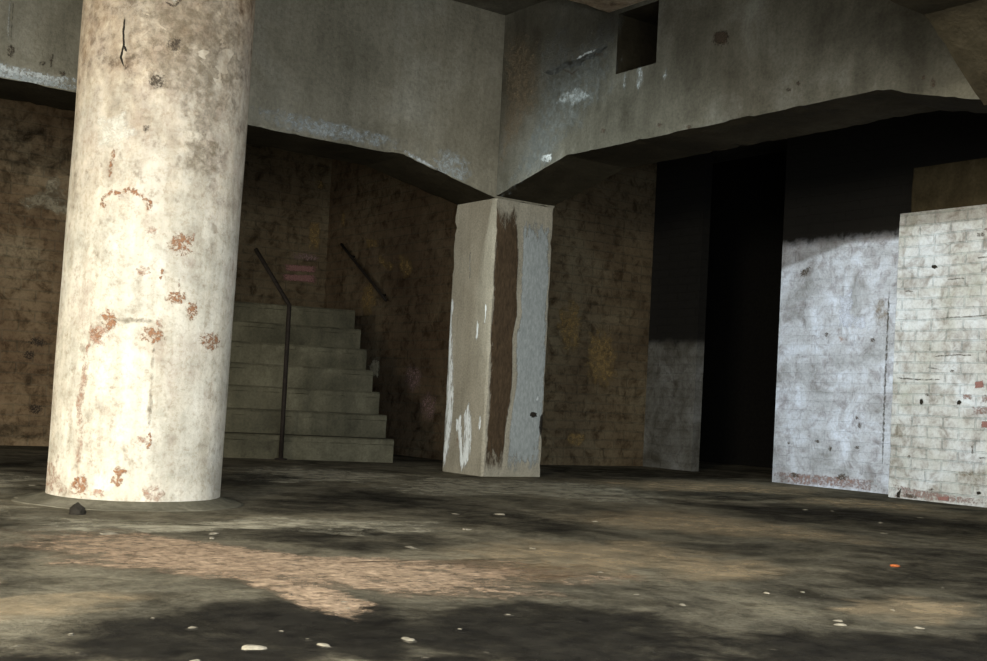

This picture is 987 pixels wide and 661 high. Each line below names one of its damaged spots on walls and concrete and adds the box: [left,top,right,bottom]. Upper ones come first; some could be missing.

crack [120,18,128,67]
rust [100,187,152,210]